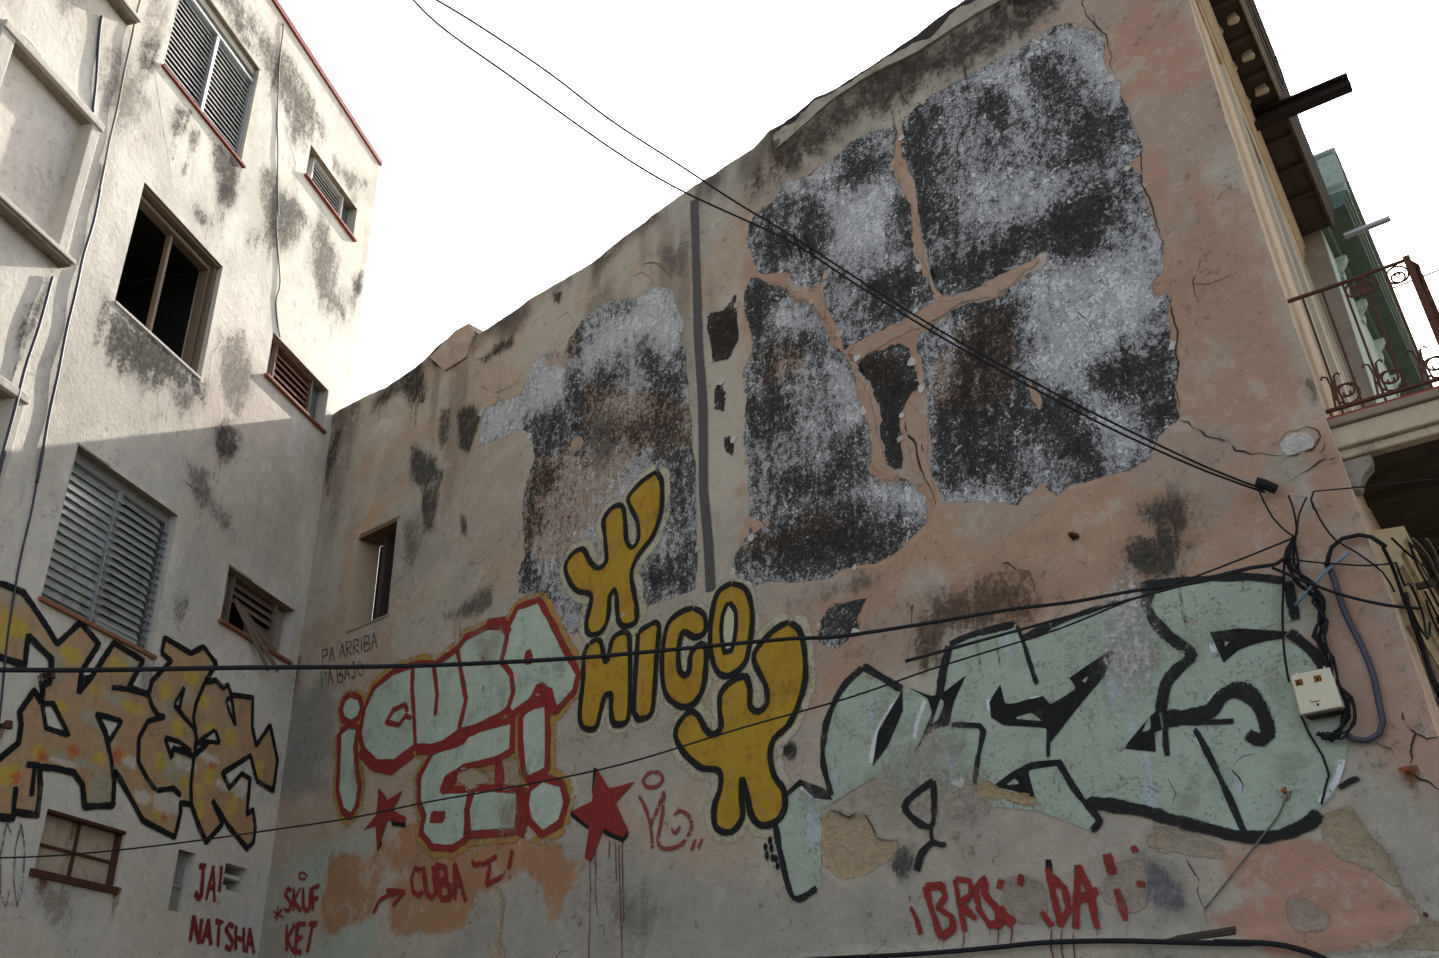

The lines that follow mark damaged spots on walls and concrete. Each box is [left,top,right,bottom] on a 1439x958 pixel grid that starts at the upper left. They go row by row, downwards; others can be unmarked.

leakage [247,170,364,320]
leakage [333,157,366,190]
leakage [746,0,1057,193]
peeling [705,20,1180,587]
leakage [98,298,252,507]
leakage [377,361,438,425]
leakage [405,405,480,564]
peeling [479,286,699,634]
leakage [1124,491,1193,602]
spalling [819,725,1037,881]
spalling [1099,824,1228,913]
spalling [1310,807,1439,958]